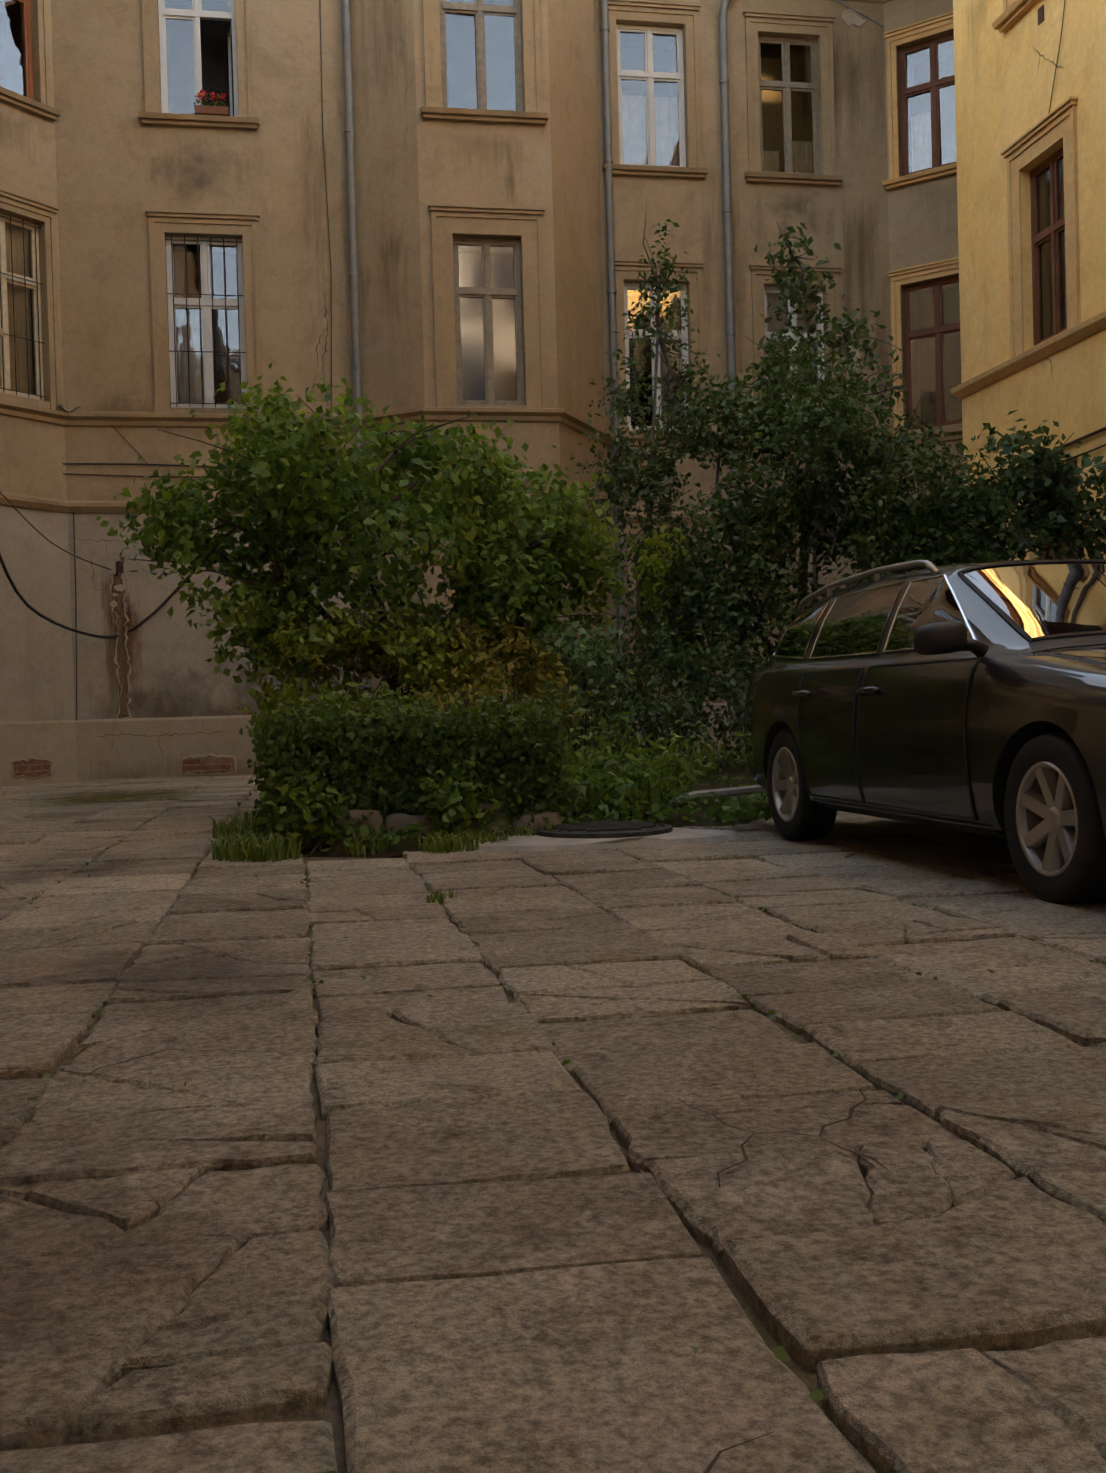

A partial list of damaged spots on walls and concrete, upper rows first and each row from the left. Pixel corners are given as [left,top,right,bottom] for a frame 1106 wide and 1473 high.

crack [678,1082,889,1189]